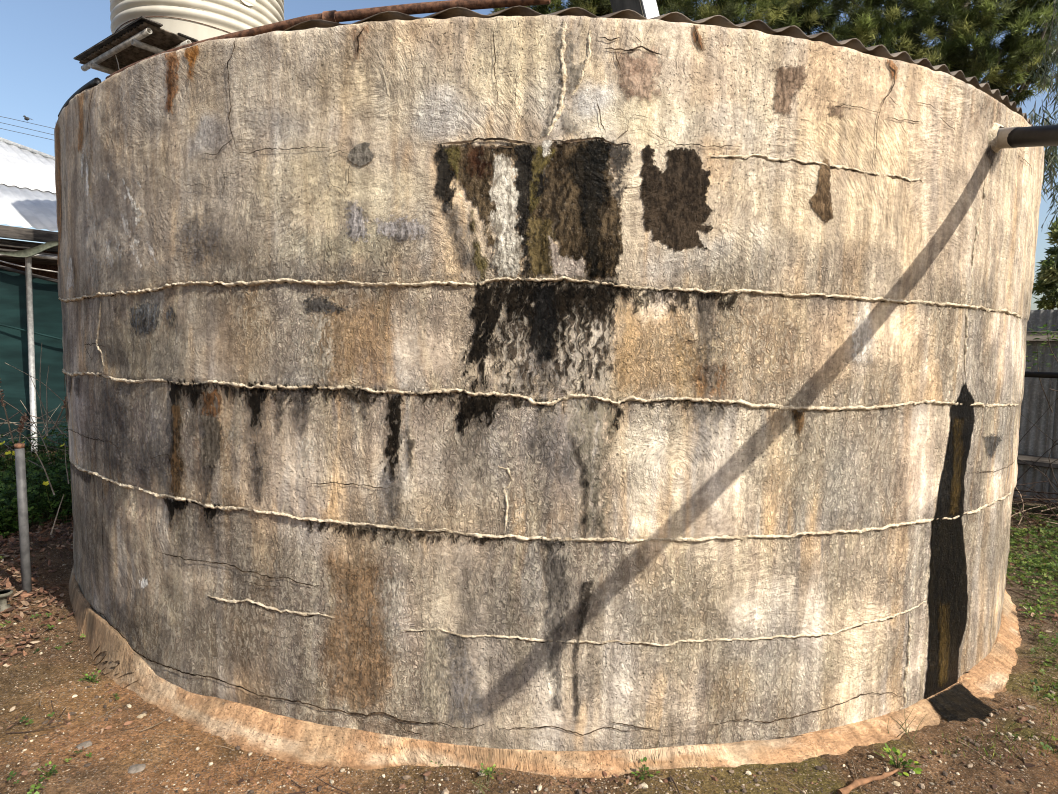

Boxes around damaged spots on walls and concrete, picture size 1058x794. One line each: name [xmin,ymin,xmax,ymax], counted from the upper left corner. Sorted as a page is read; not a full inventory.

rust [164,45,199,114]
crack [183,38,350,202]
water stain [773,65,807,114]
water stain [829,103,844,118]
water stain [810,159,834,223]
water stain [164,28,743,539]
water stain [925,383,994,722]
crack [92,608,661,736]
water stain [540,536,594,721]